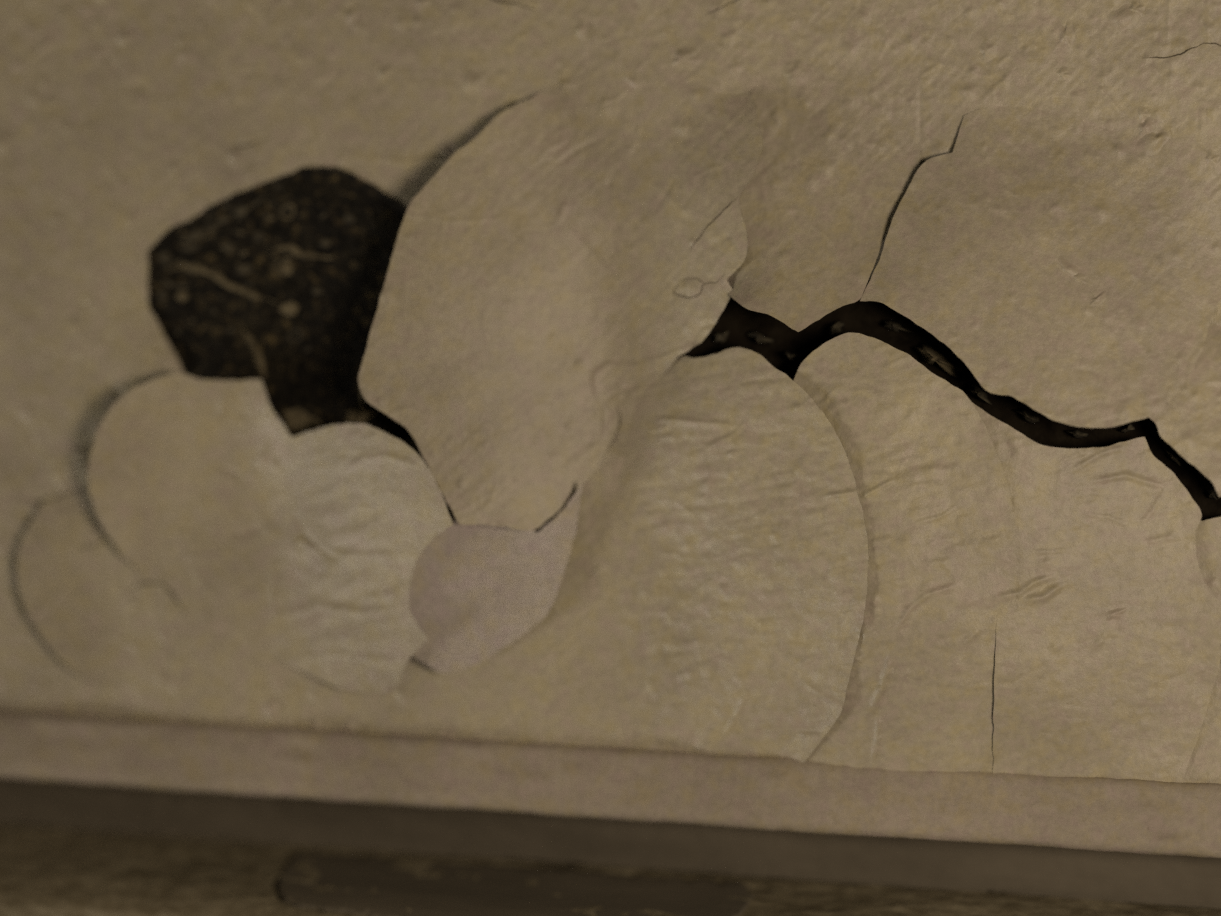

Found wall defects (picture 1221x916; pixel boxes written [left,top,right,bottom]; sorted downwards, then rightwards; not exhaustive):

peeling [17,63,1221,783]
crack [673,197,1221,521]